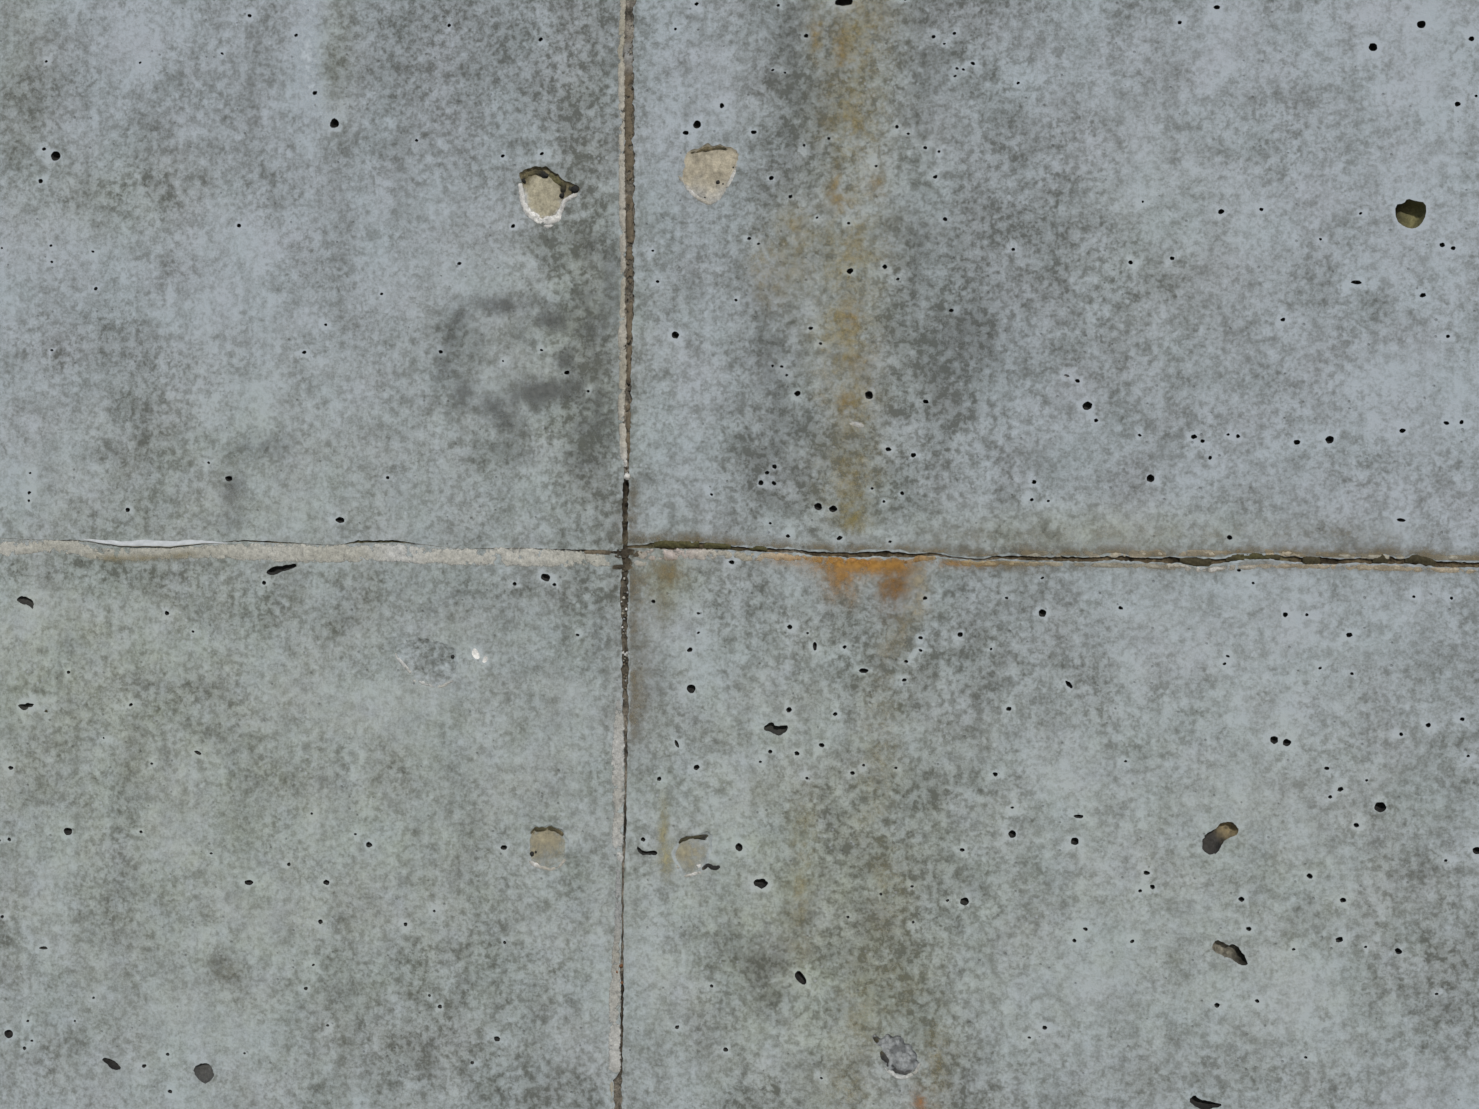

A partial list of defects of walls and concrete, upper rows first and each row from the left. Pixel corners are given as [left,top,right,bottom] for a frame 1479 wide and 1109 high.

crack [1,538,150,547]
corrosion [816,555,936,596]
crack [185,479,1479,1109]
spalling [872,1034,921,1080]